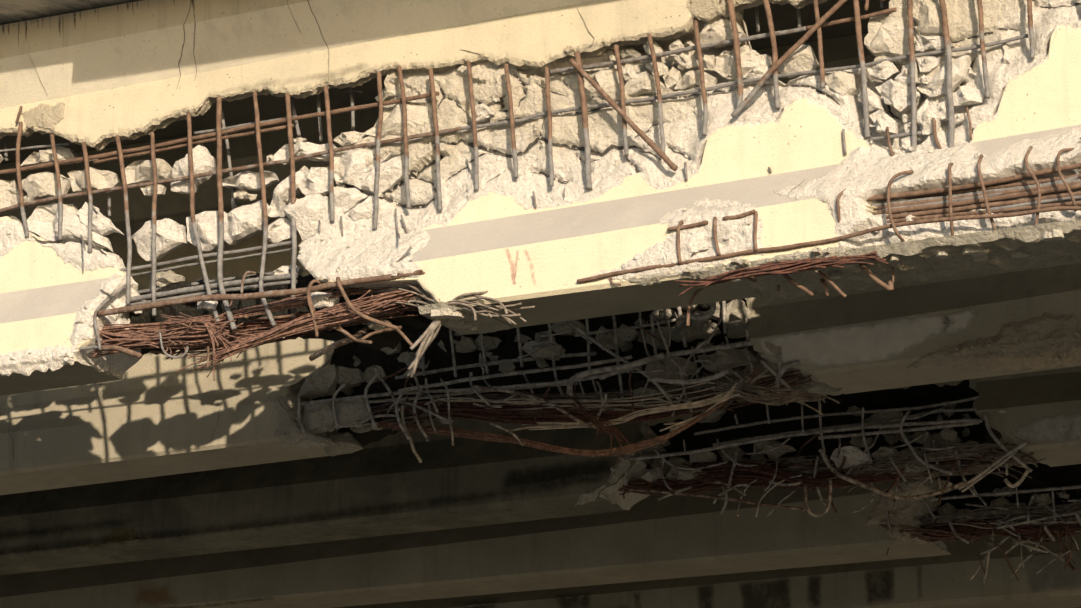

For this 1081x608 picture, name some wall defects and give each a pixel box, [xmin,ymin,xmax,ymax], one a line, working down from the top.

crack [176,0,197,89]
crack [287,0,330,80]
crack [951,0,1081,92]
spalling [21,102,65,132]
spalling [297,0,1081,299]
spalling [0,219,124,376]
spalling [418,302,513,334]